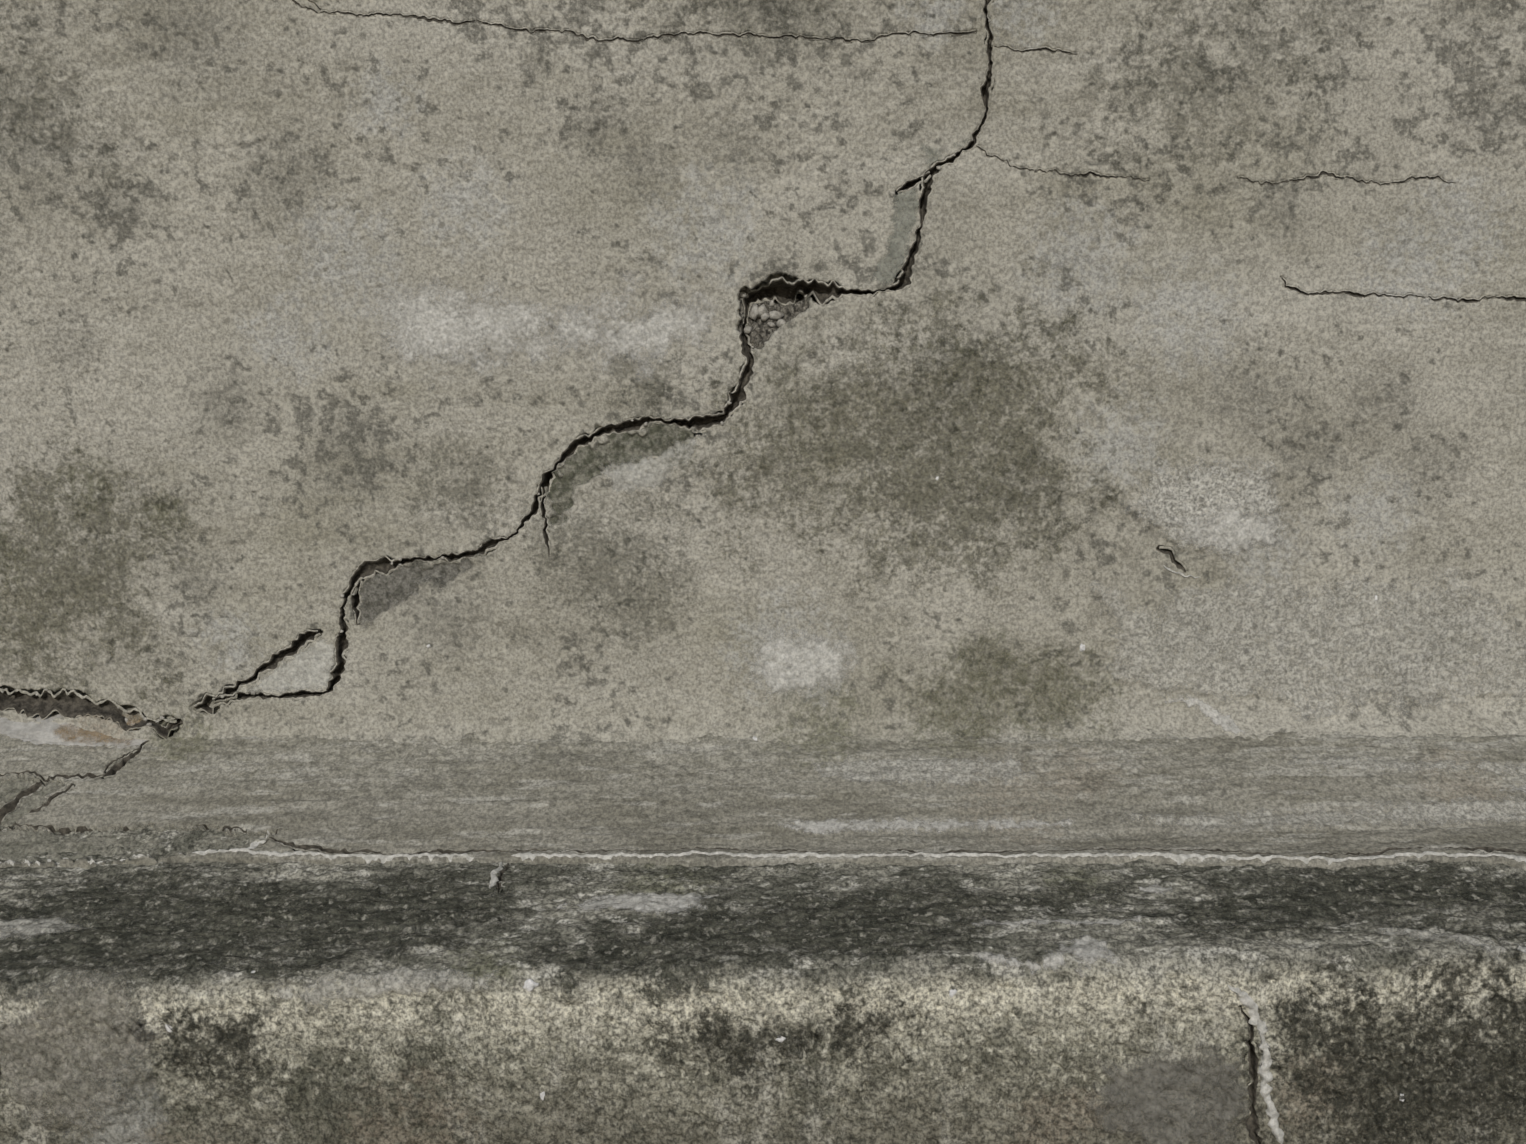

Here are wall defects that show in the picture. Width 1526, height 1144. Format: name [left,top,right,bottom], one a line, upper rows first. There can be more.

crack [0,0,1526,894]
spalling [0,777,268,863]
water stain [84,1069,162,1144]
water stain [0,865,533,1106]
water stain [522,875,1132,1086]
water stain [1170,860,1526,1144]